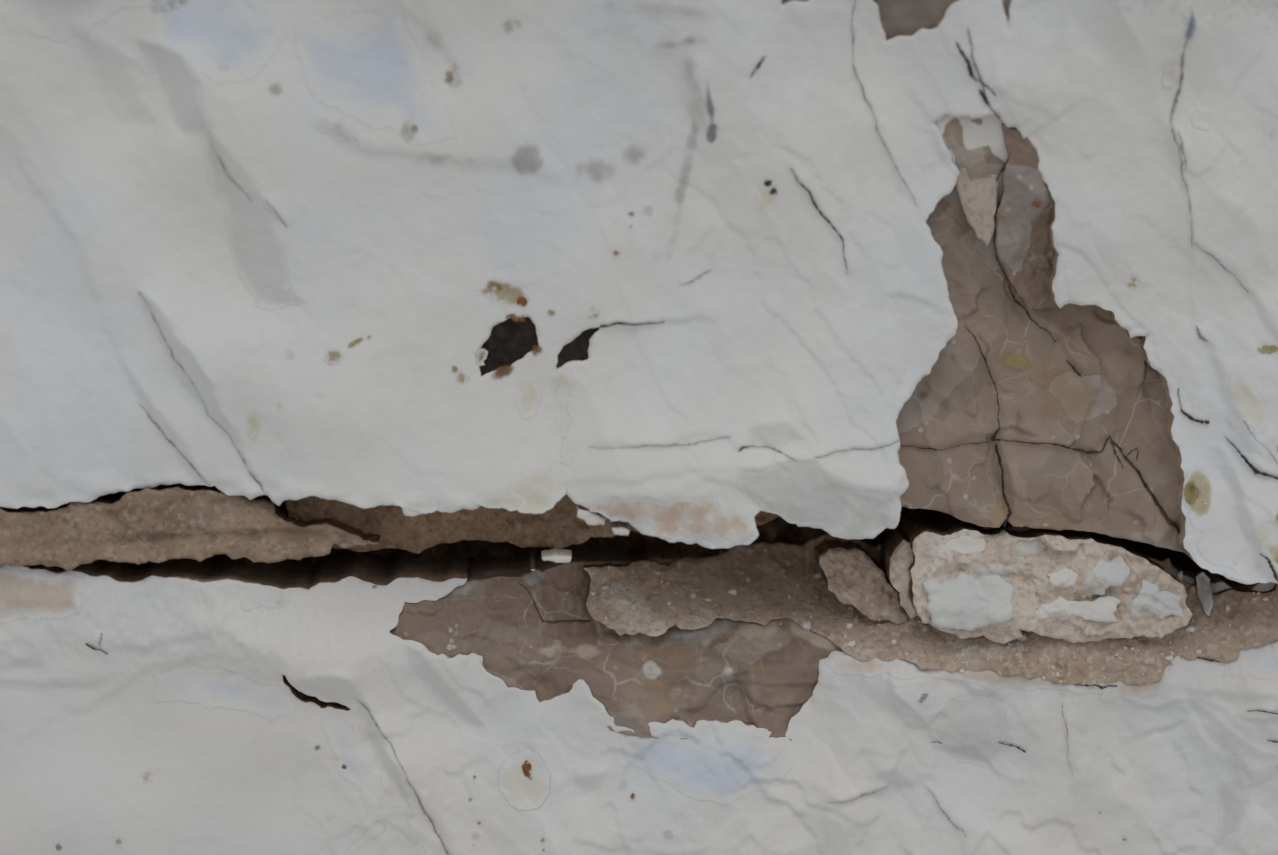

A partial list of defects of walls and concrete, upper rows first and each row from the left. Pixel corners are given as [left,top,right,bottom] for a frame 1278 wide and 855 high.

crack [1171,10,1248,292]
crack [138,292,264,491]
spalling [479,317,539,376]
spalling [556,327,600,369]
crack [600,321,664,329]
crack [592,327,1196,566]
spalling [737,118,1213,631]
crack [1178,388,1278,480]
crack [301,531,719,623]
spalling [390,504,843,741]
crack [1260,554,1278,582]
spalling [930,694,1012,767]